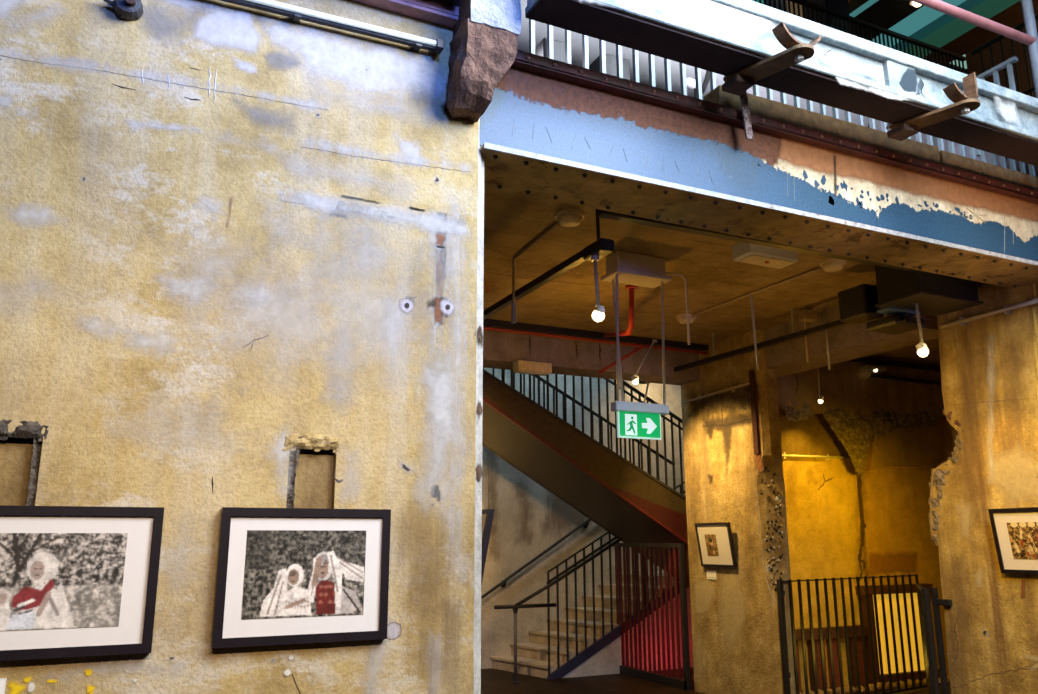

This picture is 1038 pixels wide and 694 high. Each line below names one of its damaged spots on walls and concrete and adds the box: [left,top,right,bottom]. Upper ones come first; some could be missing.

peeling [479,87,1038,261]
corrosion [495,67,1038,222]
damp [691,384,751,460]
spalling [755,455,788,604]
crack [858,474,866,580]
spalling [782,401,964,546]